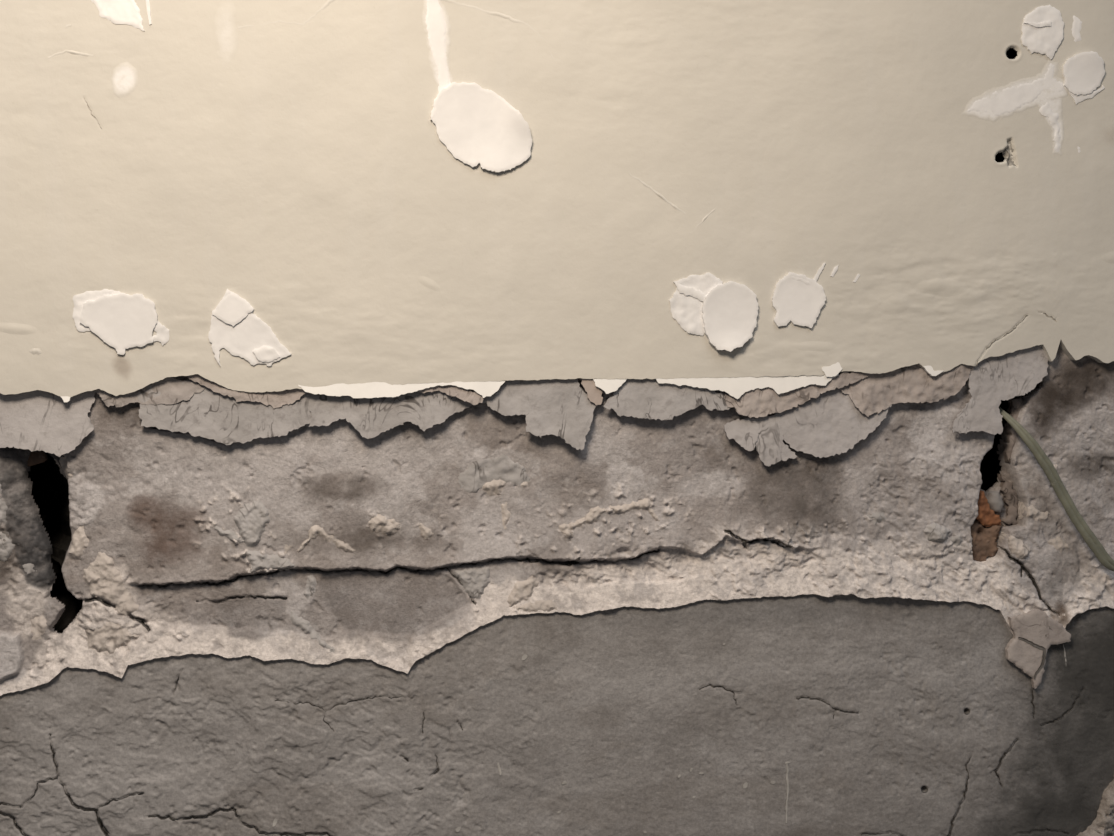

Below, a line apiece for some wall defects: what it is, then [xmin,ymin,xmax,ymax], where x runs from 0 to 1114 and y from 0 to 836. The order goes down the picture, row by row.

spalling [0,345,1114,696]
crack [724,530,792,548]
crack [146,549,659,605]
crack [1031,688,1084,726]
crack [0,742,331,836]
crack [948,739,1018,836]
spalling [1077,775,1114,836]